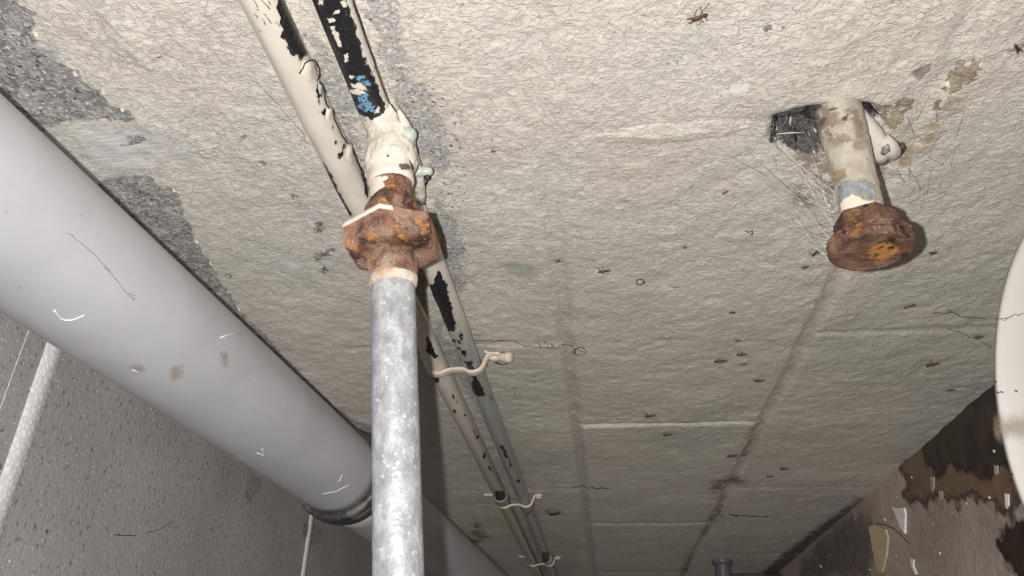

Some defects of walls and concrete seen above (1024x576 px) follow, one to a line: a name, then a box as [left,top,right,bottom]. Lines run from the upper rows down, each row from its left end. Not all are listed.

peeling [0,0,133,132]
peeling [913,63,931,80]
peeling [933,59,983,110]
peeling [121,135,146,146]
spalling [770,104,849,153]
peeling [862,97,916,130]